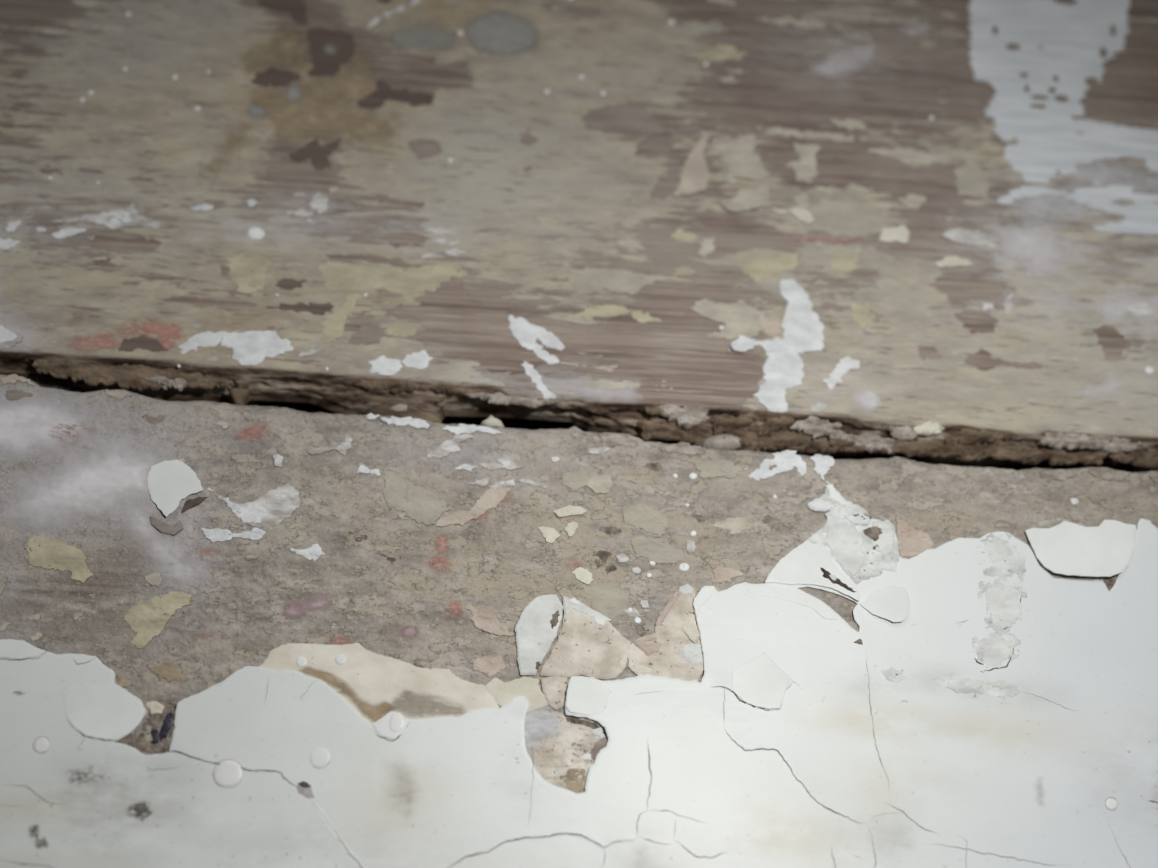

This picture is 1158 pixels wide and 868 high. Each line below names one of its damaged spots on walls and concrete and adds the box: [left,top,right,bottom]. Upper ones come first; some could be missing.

peeling [251,0,357,89]
peeling [357,53,475,110]
peeling [264,137,341,184]
peeling [408,138,445,159]
peeling [325,232,432,269]
peeling [165,264,334,315]
peeling [928,228,1050,371]
peeling [0,279,1158,868]
crack [975,595,1022,672]
crack [147,750,296,786]
crack [448,740,726,868]
crack [716,655,1069,868]